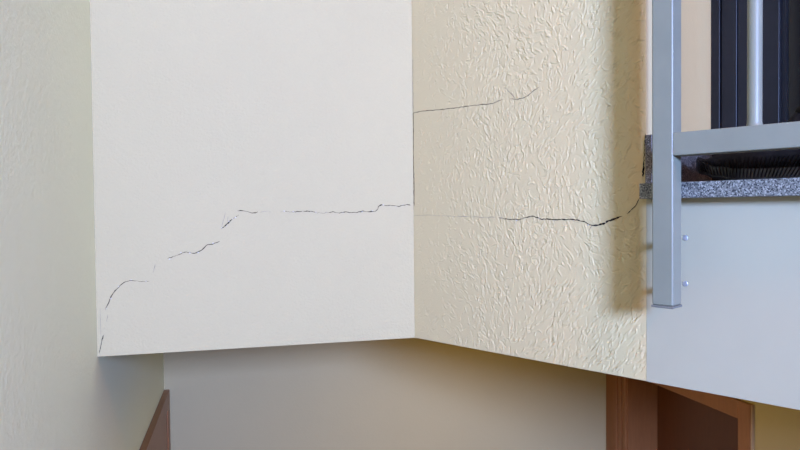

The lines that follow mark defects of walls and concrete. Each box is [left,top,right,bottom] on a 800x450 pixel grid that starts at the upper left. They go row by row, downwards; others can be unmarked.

crack [413,87,536,178]
crack [432,199,639,230]
crack [99,204,410,353]